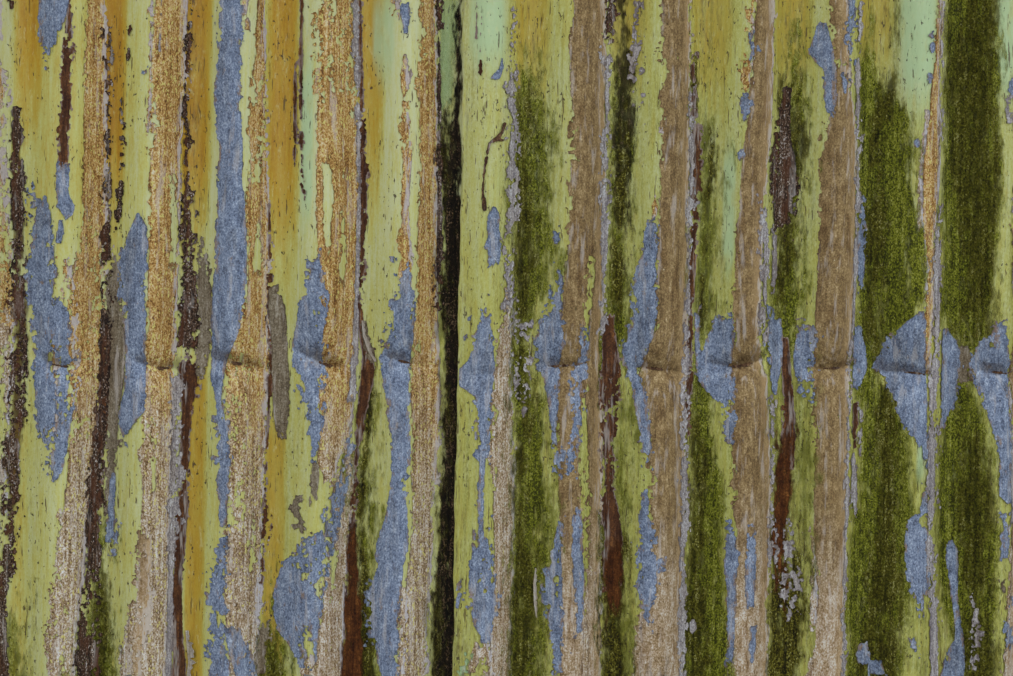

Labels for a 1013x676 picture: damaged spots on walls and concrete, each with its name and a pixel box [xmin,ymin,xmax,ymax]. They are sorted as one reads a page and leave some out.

peeling [0,0,445,676]
rust [341,0,375,676]
peeling [456,283,517,676]
water stain [500,6,534,418]
rust [597,314,624,622]
rust [769,337,799,592]
peeling [619,0,1013,676]